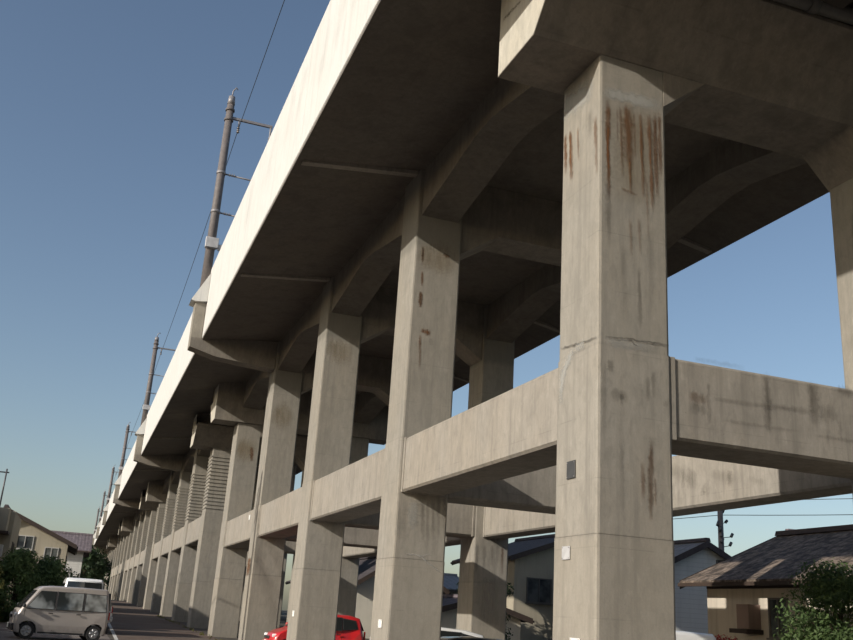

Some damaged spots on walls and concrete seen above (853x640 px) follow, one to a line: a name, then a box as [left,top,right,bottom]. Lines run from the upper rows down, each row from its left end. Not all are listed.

corrosion [564,134,572,170]
corrosion [625,108,661,198]